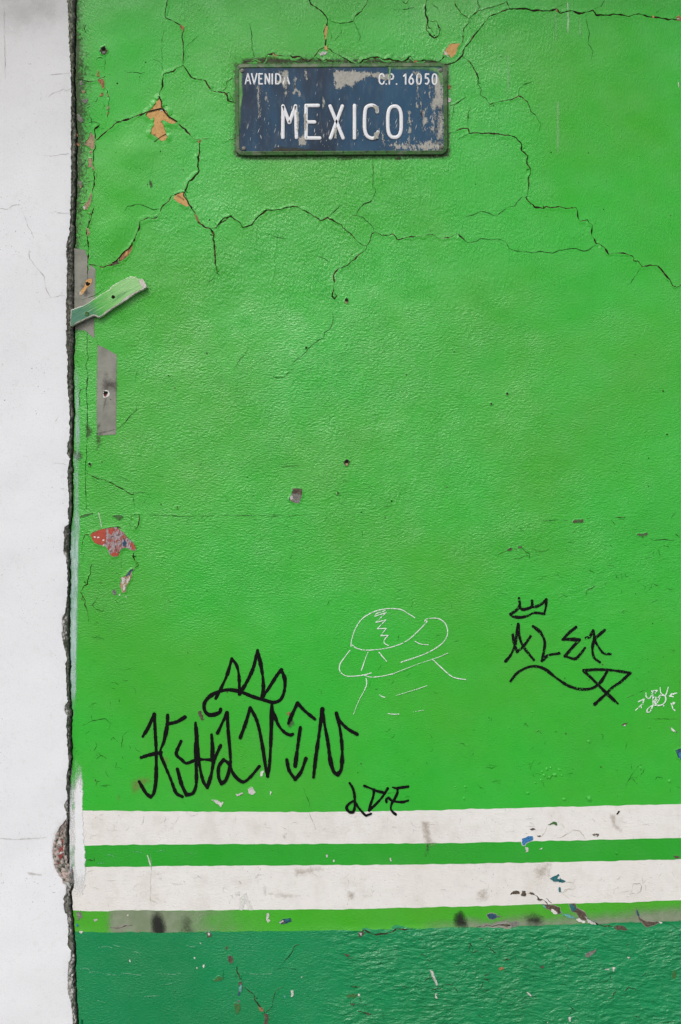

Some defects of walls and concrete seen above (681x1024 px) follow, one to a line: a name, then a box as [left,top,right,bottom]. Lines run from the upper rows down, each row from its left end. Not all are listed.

peeling [441,41,463,60]
peeling [139,93,181,145]
peeling [172,189,200,222]
crack [40,0,681,378]
spalling [52,0,138,1024]
spalling [287,486,304,506]
peeling [521,821,558,852]
peeling [510,890,595,925]
peeling [635,909,663,927]